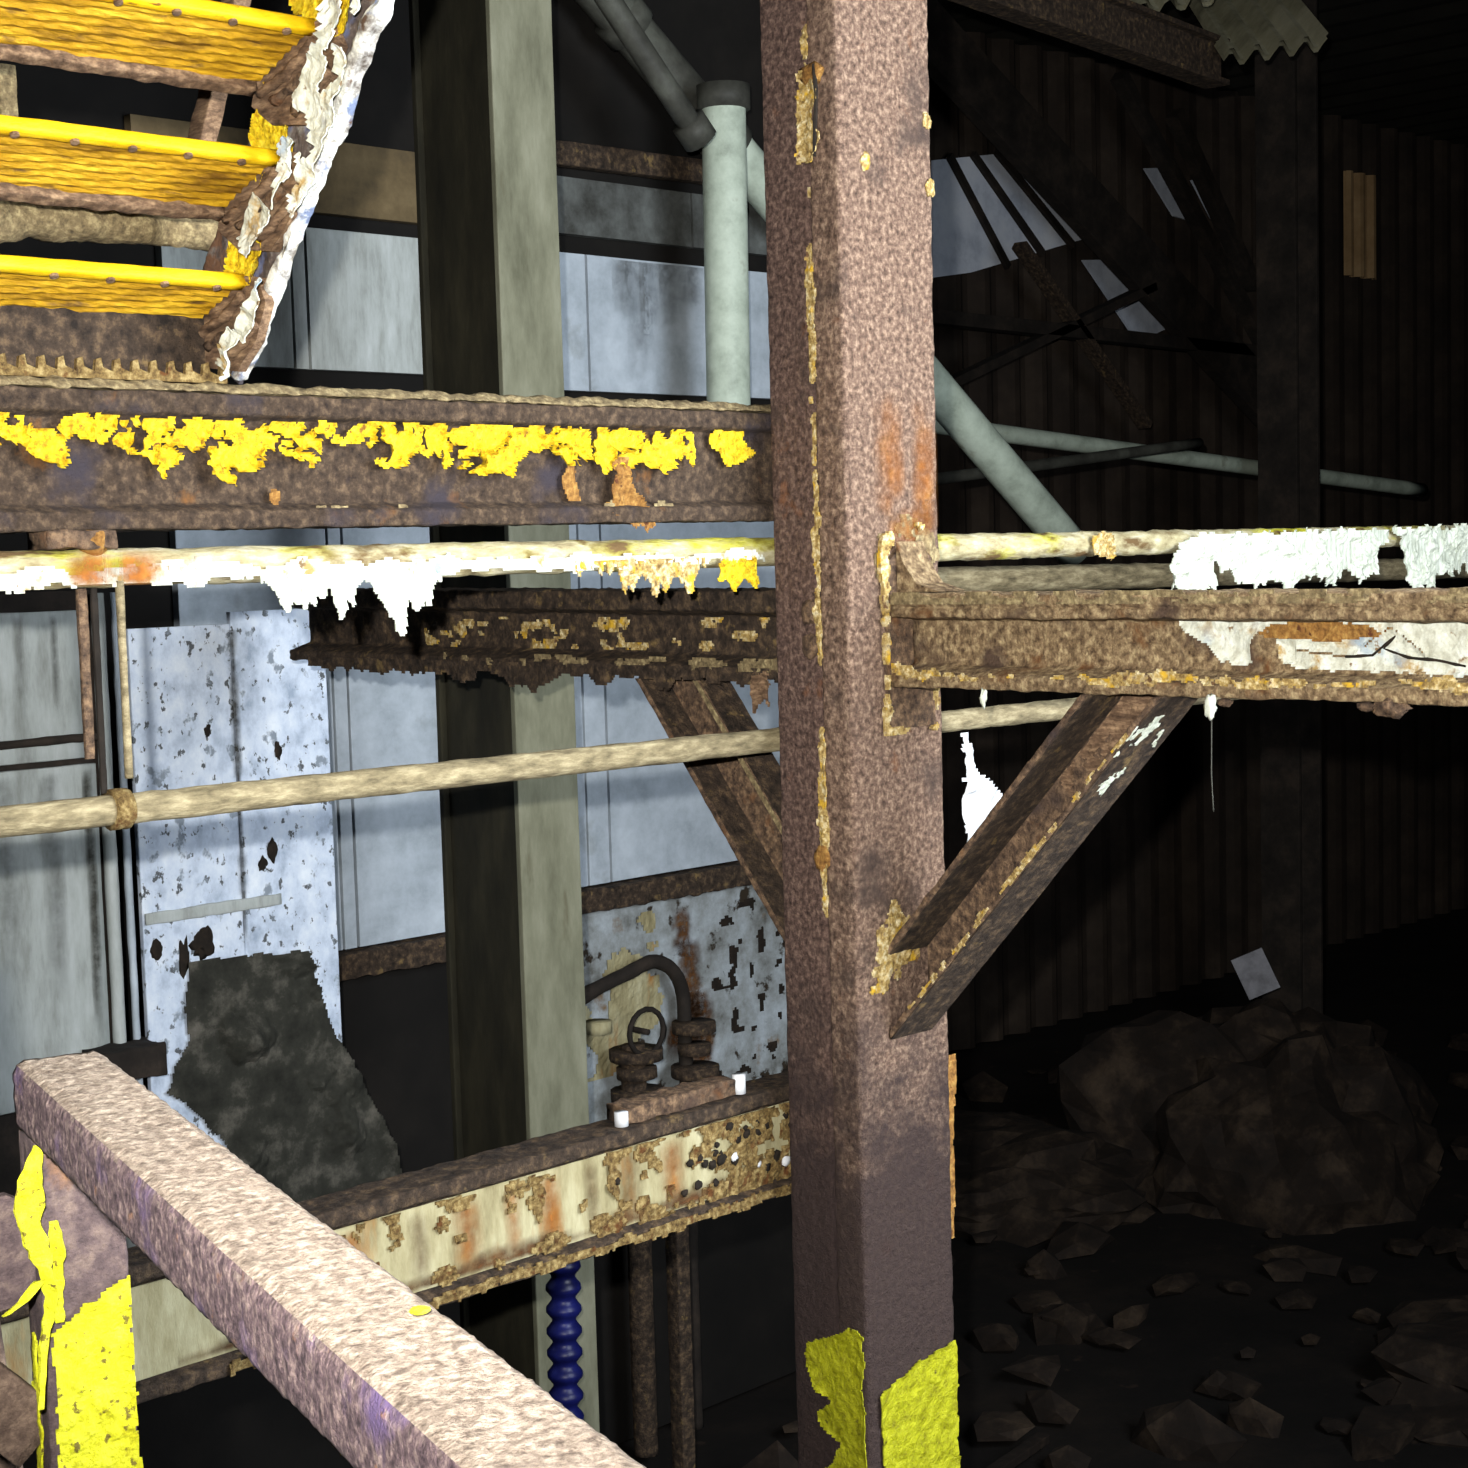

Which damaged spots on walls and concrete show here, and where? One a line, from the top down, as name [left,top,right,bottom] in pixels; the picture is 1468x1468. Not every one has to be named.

corrosion [794,24,824,165]
peeling [215,0,361,381]
peeling [0,412,756,533]
corrosion [804,243,823,666]
corrosion [814,727,831,918]
corrosion [877,461,1389,736]
corrosion [1050,669,1413,803]
peeling [1179,620,1468,678]
crack [1345,635,1466,667]
corrosion [869,899,920,995]
corrosion [409,1102,791,1310]
corrosion [948,1054,957,1239]